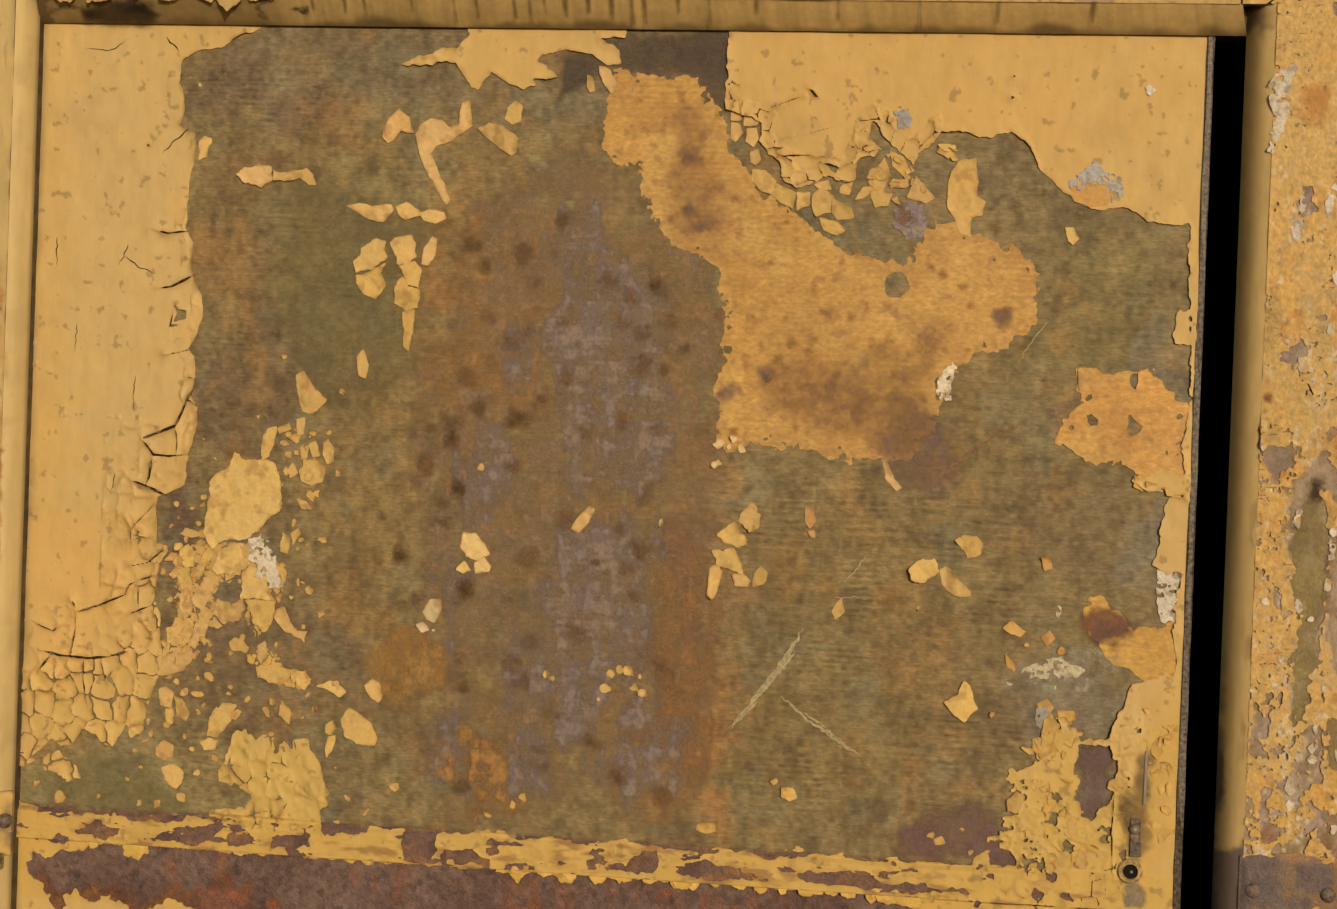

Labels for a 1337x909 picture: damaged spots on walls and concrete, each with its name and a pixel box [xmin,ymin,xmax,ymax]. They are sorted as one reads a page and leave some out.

peeling [602,30,712,54]
peeling [885,272,910,298]
crack [110,375,193,521]
crack [39,551,163,695]
rust [1082,609,1130,646]
peeling [1261,430,1337,810]
peeling [122,839,149,861]
peeling [1011,829,1058,874]
peeling [1020,779,1105,869]
peeling [1097,824,1113,844]
rust [42,880,248,909]
peeling [496,866,935,909]